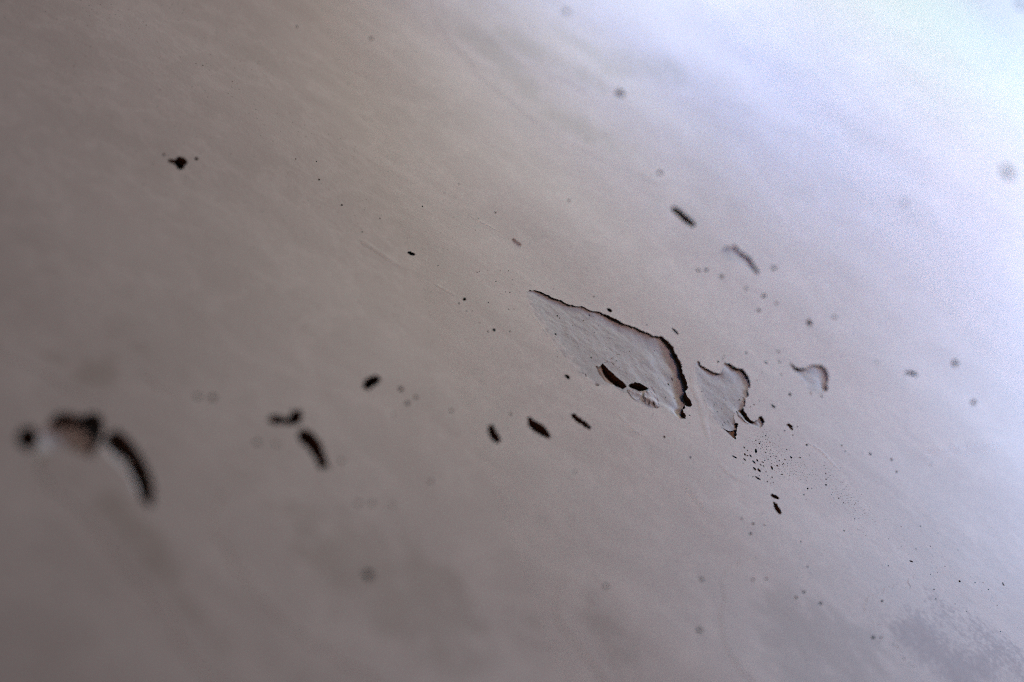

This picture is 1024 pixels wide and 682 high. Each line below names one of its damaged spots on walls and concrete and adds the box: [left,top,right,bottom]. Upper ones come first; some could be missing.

spalling [671,207,696,227]
spalling [720,245,759,274]
spalling [527,290,765,439]
spalling [789,362,828,395]
spalling [487,424,501,443]